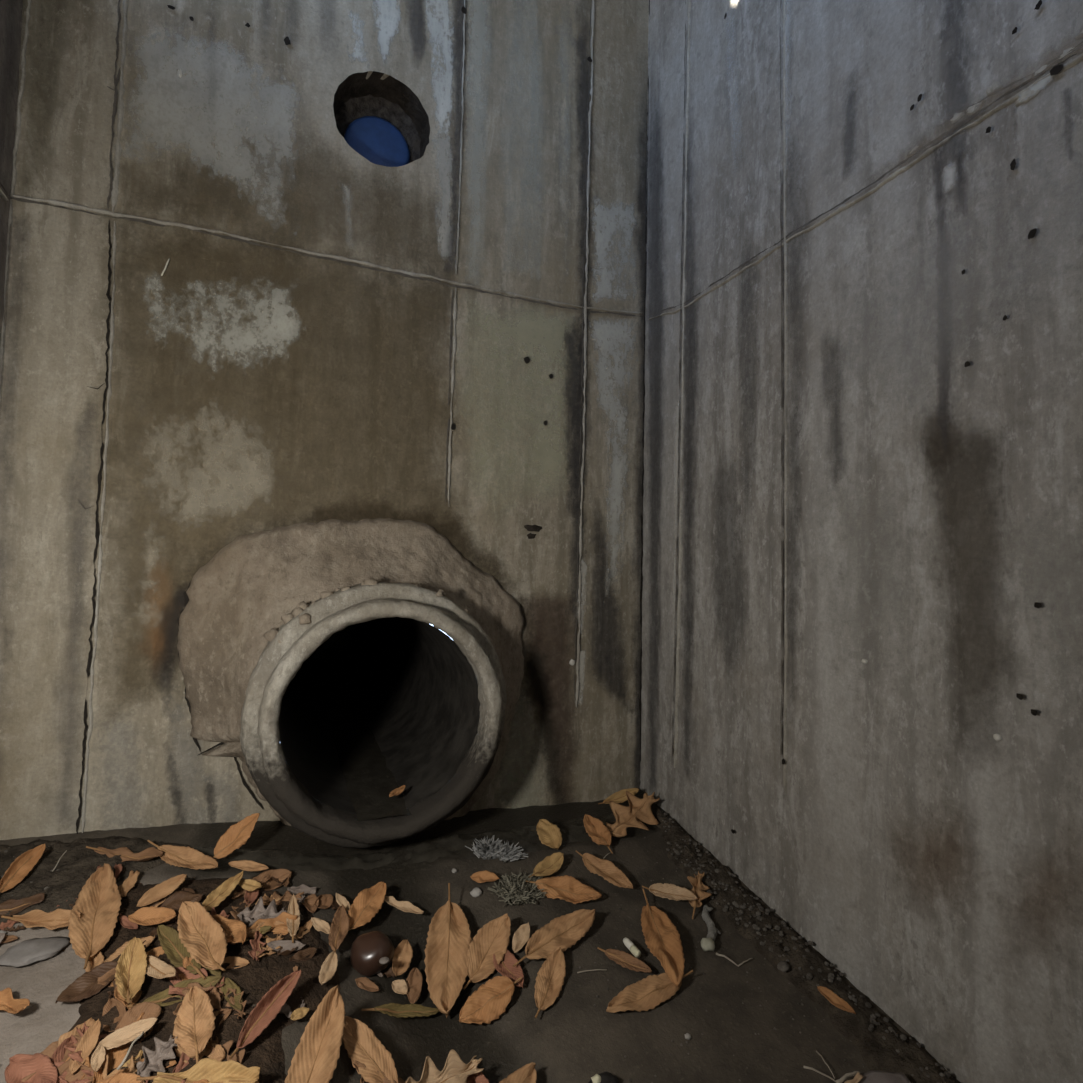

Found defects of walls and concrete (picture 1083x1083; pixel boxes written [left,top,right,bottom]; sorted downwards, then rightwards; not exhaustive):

damp [349,0,490,275]
peeling [1015,28,1083,107]
damp [470,28,662,809]
damp [673,234,695,689]
damp [929,164,1000,695]